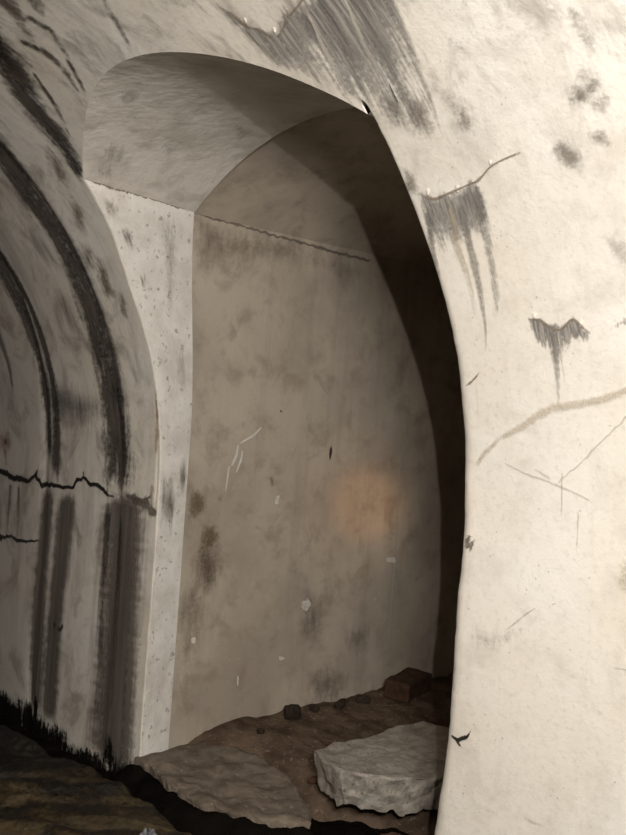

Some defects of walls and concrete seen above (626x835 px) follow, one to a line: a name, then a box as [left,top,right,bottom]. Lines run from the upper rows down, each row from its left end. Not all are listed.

damp [0,37,82,178]
damp [0,0,84,89]
damp [0,142,130,490]
crack [0,534,38,543]
crack [0,469,114,498]
damp [0,490,142,778]